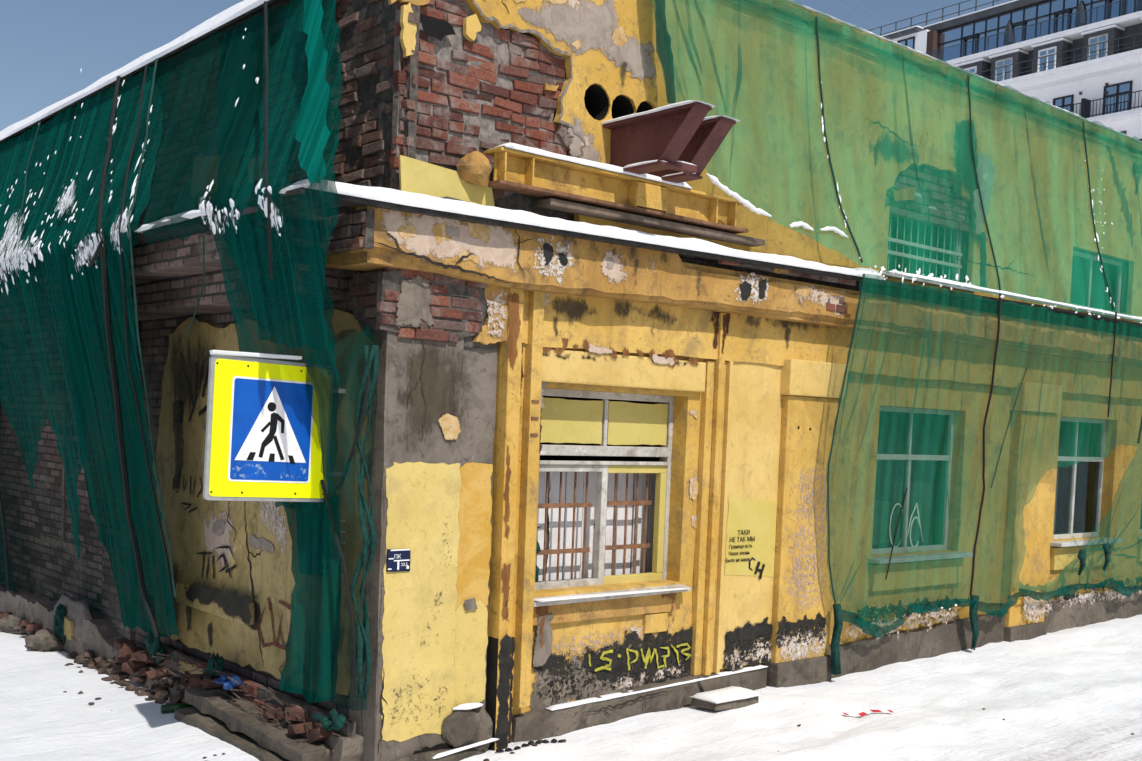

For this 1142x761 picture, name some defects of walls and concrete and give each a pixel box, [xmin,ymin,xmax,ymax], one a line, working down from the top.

spalling [388,0,655,200]
spalling [327,208,575,345]
damp [552,298,591,335]
damp [615,301,631,316]
peeling [601,250,655,284]
damp [648,307,677,330]
peeling [718,254,856,317]
peeling [439,413,461,440]
peeling [203,501,287,573]
damp [169,562,260,631]